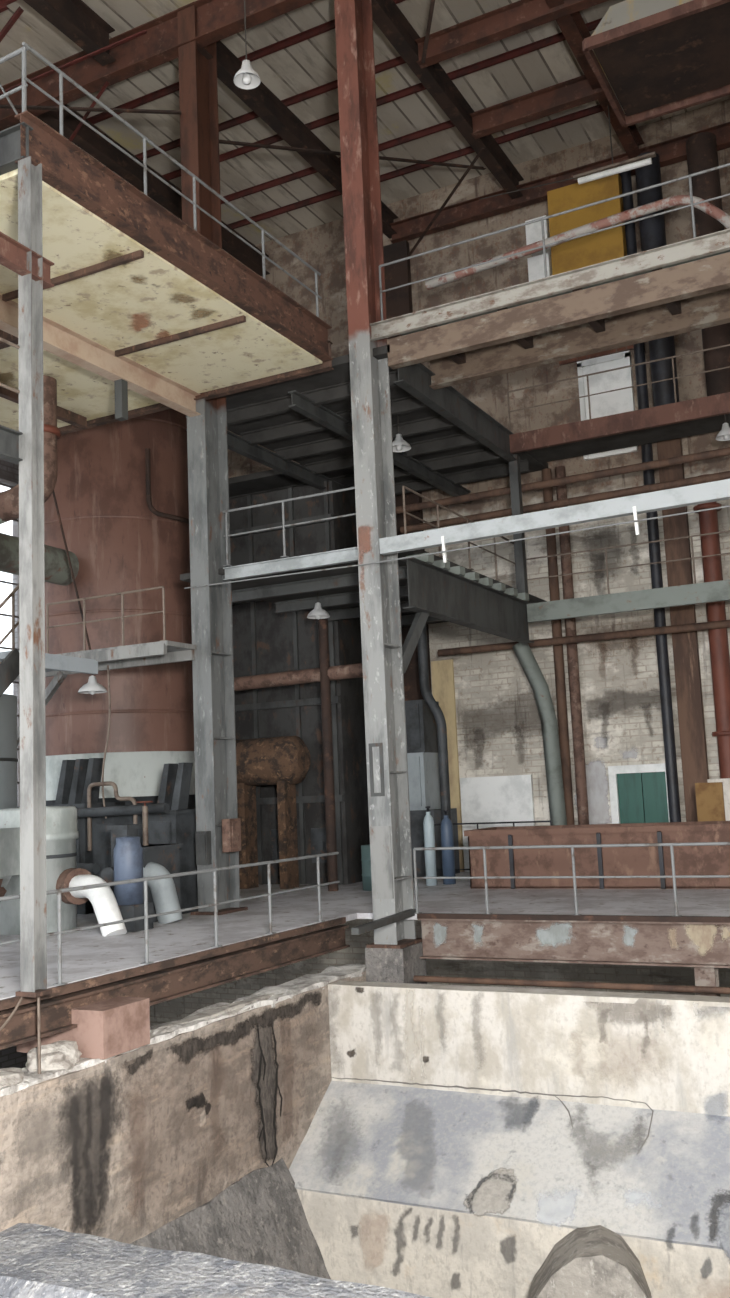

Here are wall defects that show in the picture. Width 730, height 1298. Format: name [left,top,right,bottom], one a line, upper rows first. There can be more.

peeling [434,924,446,944]
peeling [537,924,571,946]
peeling [624,927,635,945]
peeling [669,924,730,954]
water stain [63,1077,120,1234]
peeling [464,1168,516,1216]
peeling [709,1191,730,1259]
water stain [394,1209,459,1275]
water stain [501,1238,515,1262]